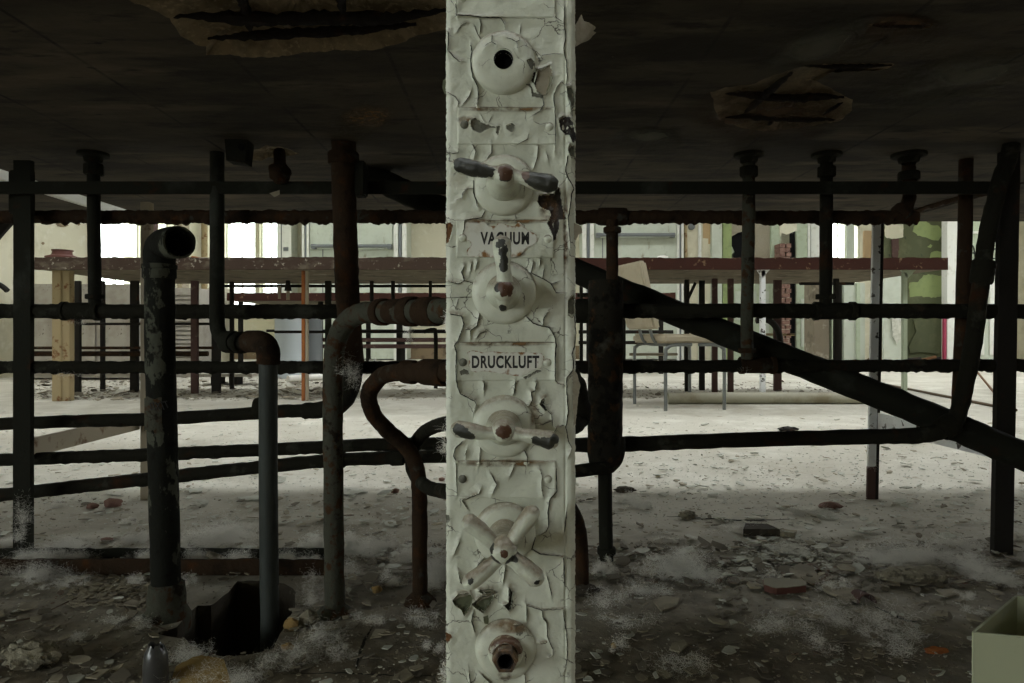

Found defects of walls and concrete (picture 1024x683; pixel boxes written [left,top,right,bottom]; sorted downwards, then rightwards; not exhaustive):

spalling [130,0,446,58]
peeling [526,58,553,98]
peeling [567,85,575,110]
peeling [470,118,515,134]
crack [446,261,485,408]
peeling [572,369,580,425]
crack [453,260,577,665]
peeling [443,588,513,625]
peeling [311,660,359,683]
peeling [373,655,442,683]
peeling [575,631,635,682]
peeling [685,587,789,681]